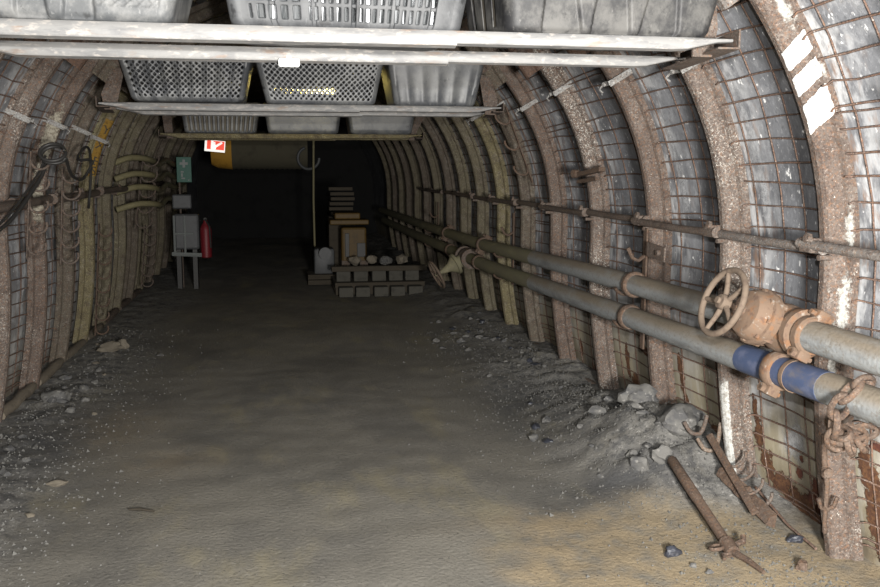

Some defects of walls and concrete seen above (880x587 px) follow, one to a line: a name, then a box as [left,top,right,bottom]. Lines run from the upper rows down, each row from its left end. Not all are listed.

rust [752,393,822,524]
rust [858,442,880,559]